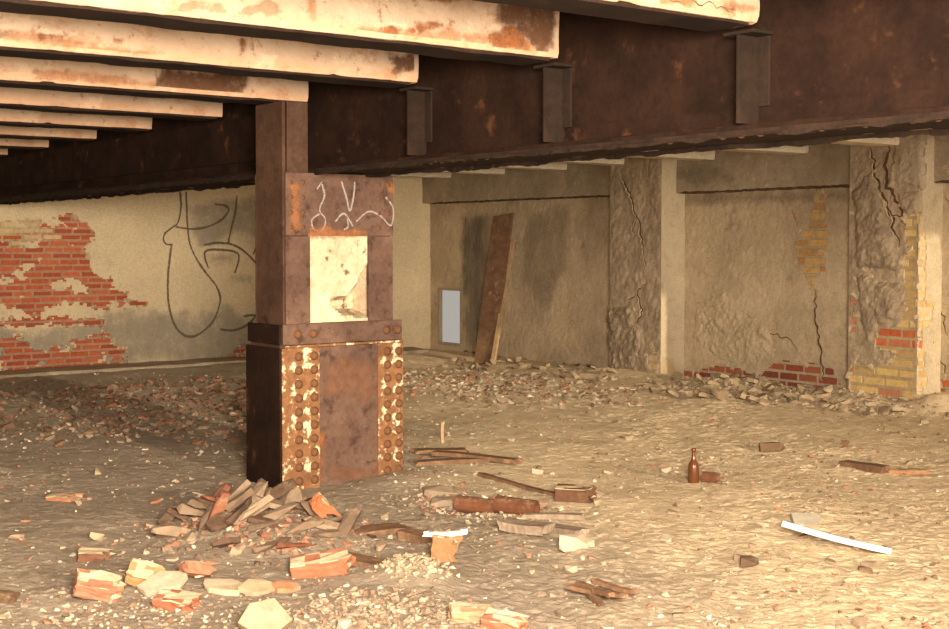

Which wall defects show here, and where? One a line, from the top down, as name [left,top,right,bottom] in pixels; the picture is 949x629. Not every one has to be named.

crack [671,0,735,16]
rust [360,4,555,52]
rust [0,32,129,52]
rust [389,54,414,72]
rust [34,70,126,84]
rust [291,184,300,229]
rust [309,227,363,237]
flaking render [684,135,934,400]
flaking render [0,213,148,370]
flaking render [940,374,949,392]